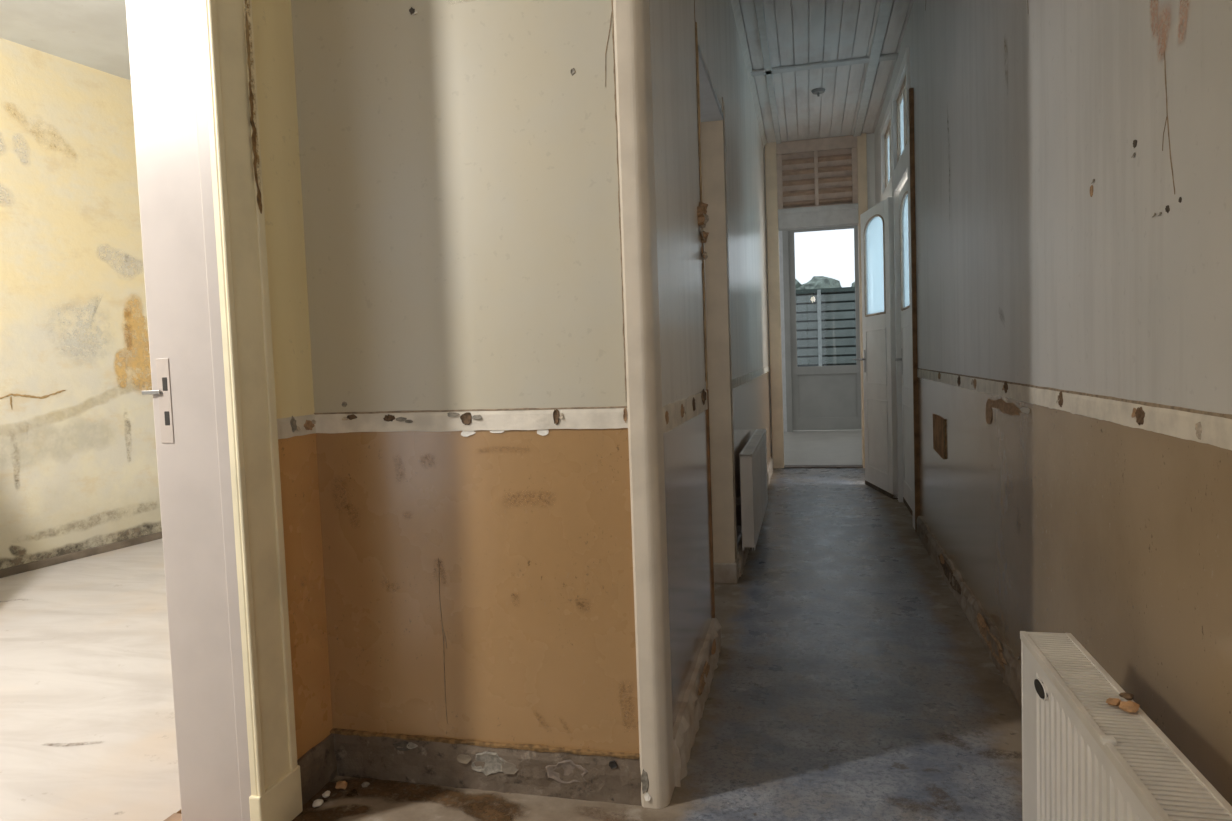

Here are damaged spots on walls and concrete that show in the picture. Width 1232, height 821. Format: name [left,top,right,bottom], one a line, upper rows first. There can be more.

crack [244,0,262,214]
damp [102,524,162,545]
damp [0,541,87,567]